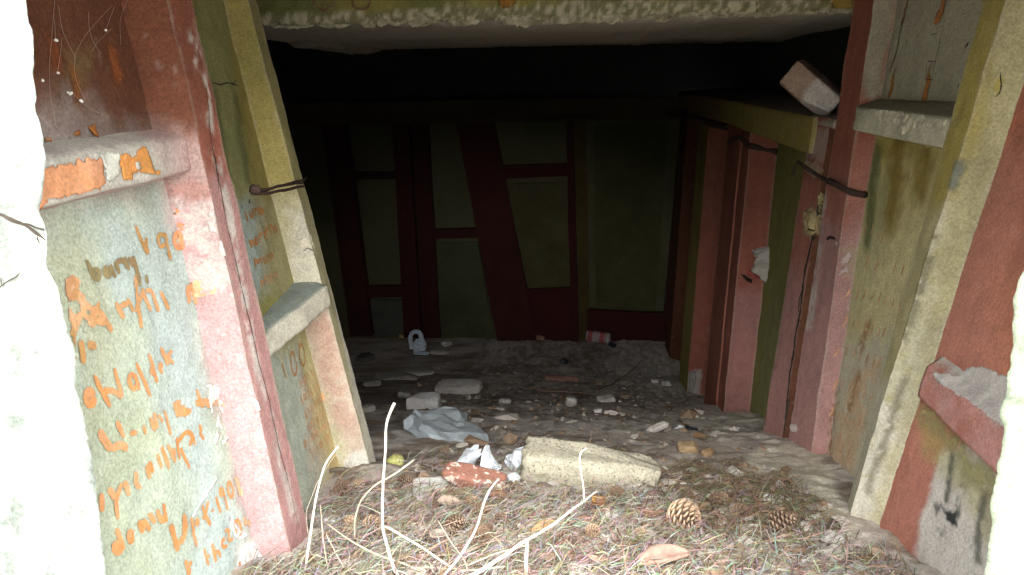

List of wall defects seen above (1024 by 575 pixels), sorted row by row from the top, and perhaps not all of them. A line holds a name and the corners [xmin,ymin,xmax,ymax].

peeling [39,146,161,209]
damp [865,145,880,247]
damp [888,141,903,227]
crack [783,204,820,434]
peeling [932,366,1007,427]